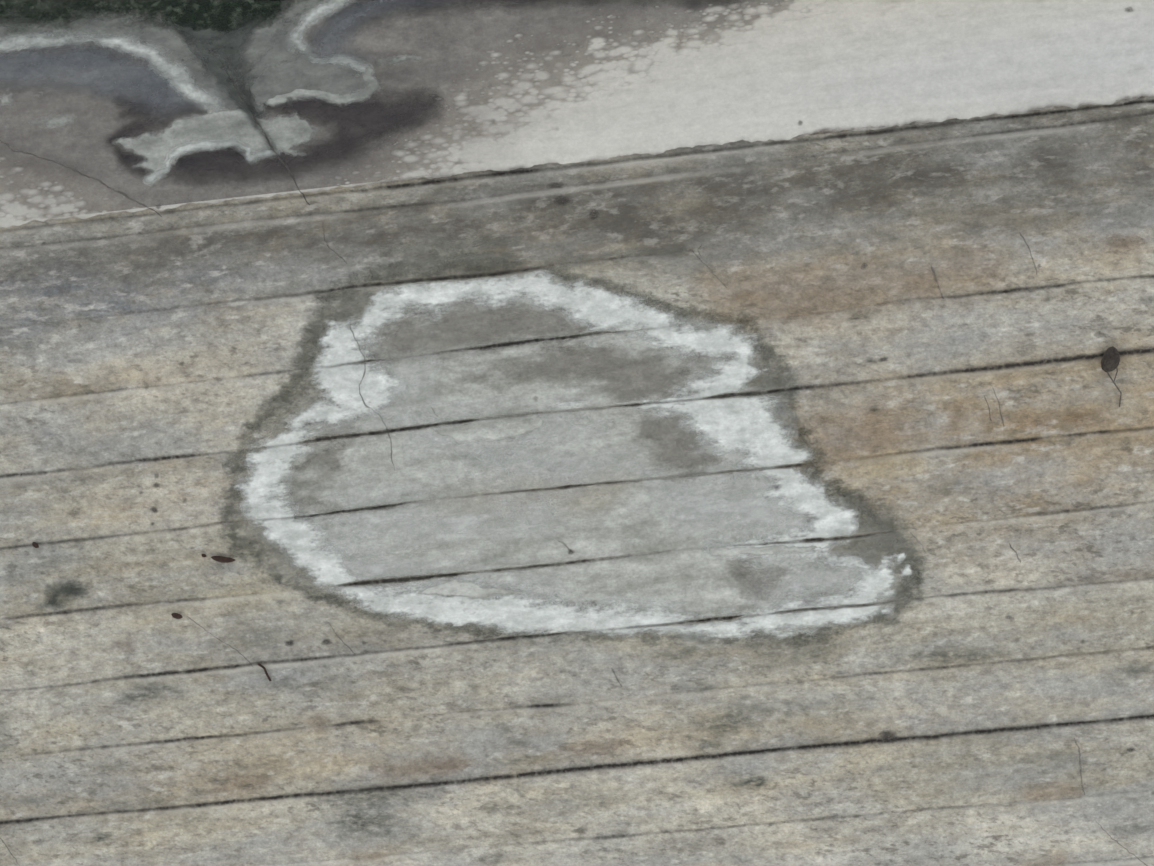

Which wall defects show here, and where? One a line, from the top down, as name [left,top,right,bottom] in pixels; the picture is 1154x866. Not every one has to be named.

crack [0,140,162,217]
crack [219,59,347,264]
damp [0,0,793,221]
crack [350,320,395,470]
damp [221,239,923,648]